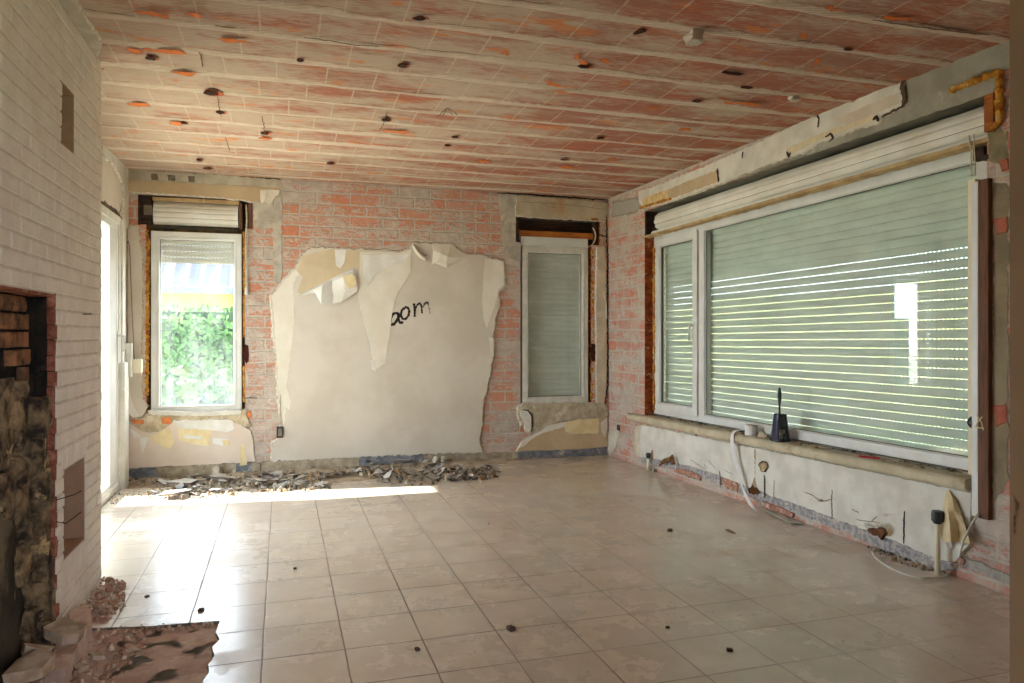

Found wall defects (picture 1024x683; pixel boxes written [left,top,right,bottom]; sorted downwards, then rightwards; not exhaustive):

peeling [639,81,907,209]
peeling [482,259,505,357]
peeling [272,249,410,425]
spalling [129,389,252,454]
spalling [516,402,609,448]
flaking render [676,468,702,481]
flaking render [722,477,739,493]
crack [805,492,877,521]
crack [900,511,908,544]